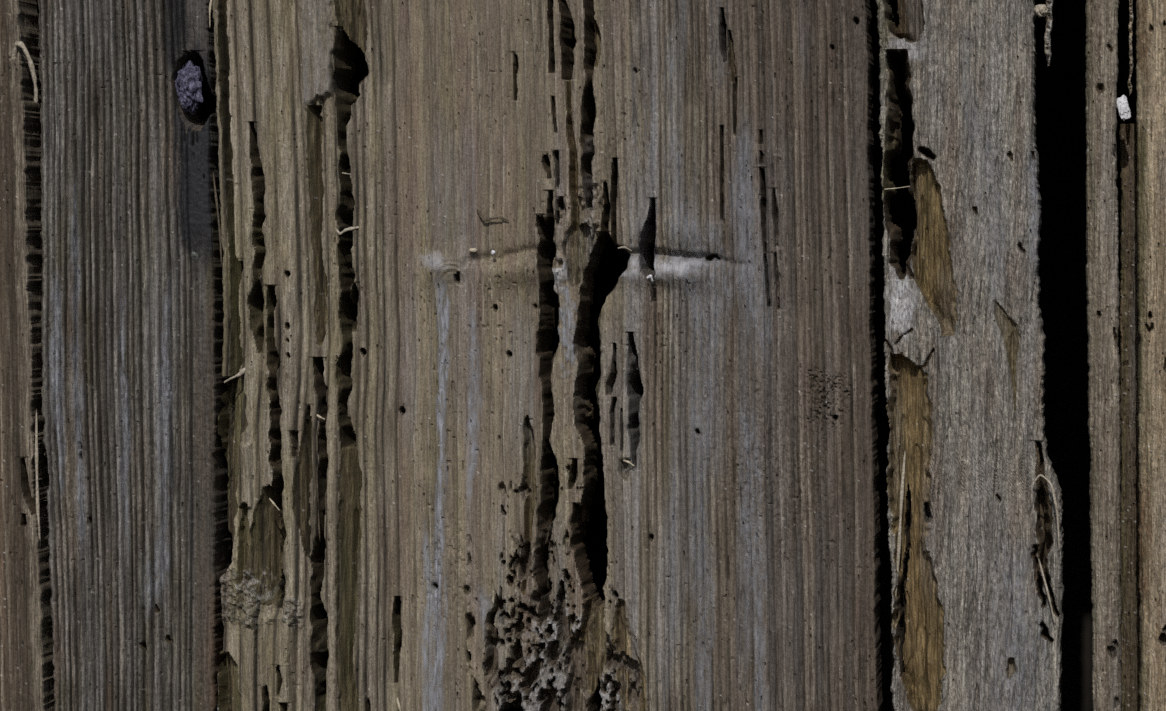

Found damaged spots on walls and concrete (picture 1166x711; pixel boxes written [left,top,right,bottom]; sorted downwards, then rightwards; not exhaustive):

crack [239,28,368,711]
crack [512,54,520,101]
crack [534,0,657,621]
crack [565,677,603,711]